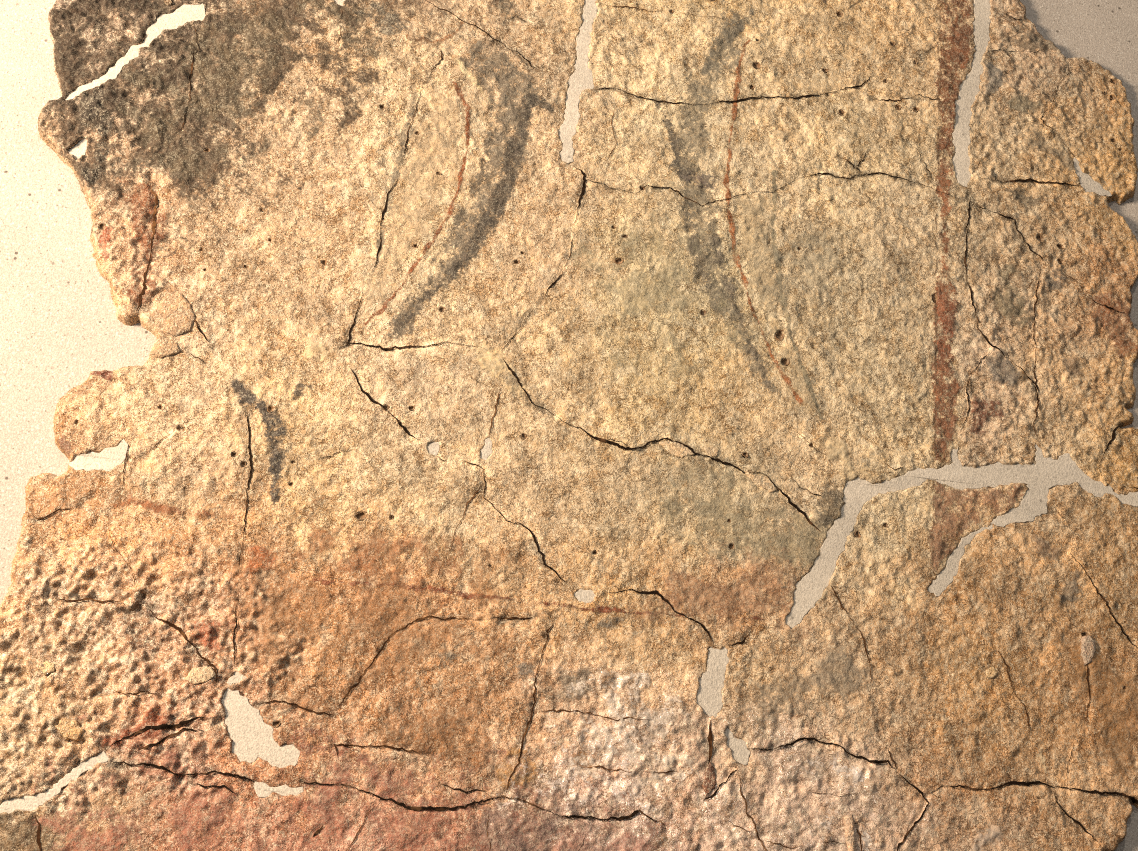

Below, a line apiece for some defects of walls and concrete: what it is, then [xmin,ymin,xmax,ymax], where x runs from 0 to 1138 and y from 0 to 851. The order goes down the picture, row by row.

crack [425,0,538,70]
crack [137,187,158,310]
crack [191,319,211,364]
crack [339,46,1124,531]
crack [50,411,253,686]
crack [436,458,565,586]
crack [609,589,776,646]
crack [830,585,872,685]
crack [1052,505,1137,648]
crack [112,716,254,794]
crack [259,615,677,851]
crack [704,718,1138,851]